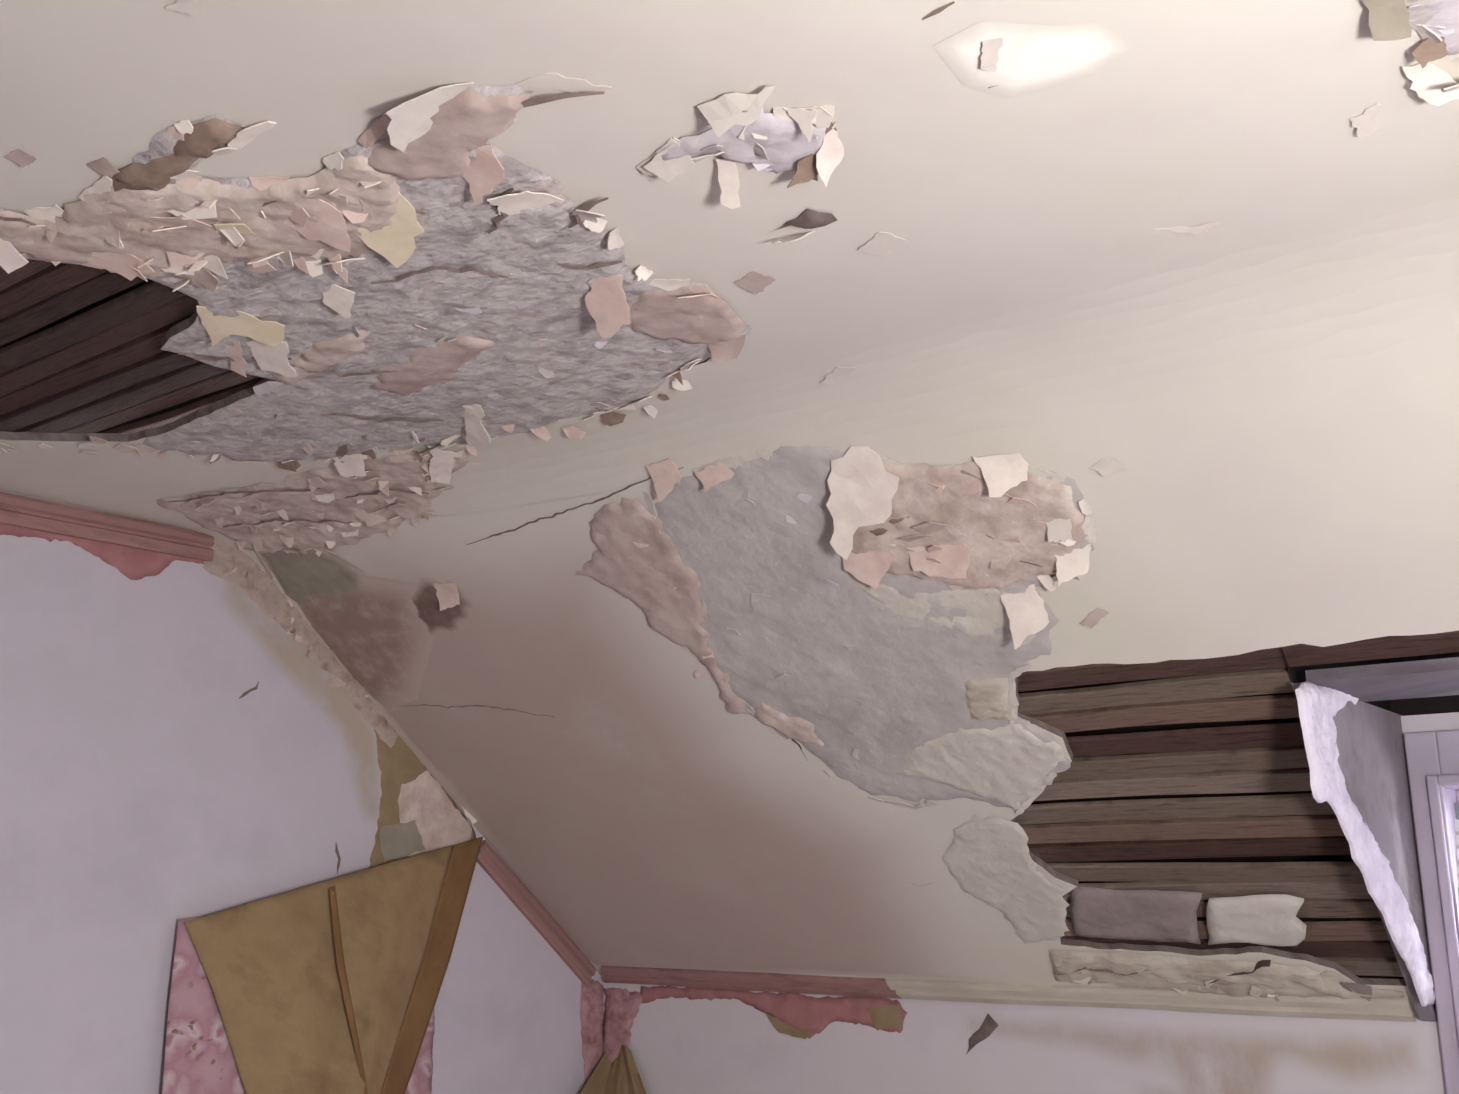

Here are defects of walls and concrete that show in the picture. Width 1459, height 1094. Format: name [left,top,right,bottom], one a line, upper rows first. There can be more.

peeling [1362,0,1459,106]
peeling [636,85,844,209]
peeling [1350,103,1381,138]
peeling [733,271,776,294]
flaking render [0,73,752,578]
crack [467,467,684,545]
peeling [412,577,474,636]
flaking render [575,446,1459,1007]
water stain [960,1009,1435,1094]